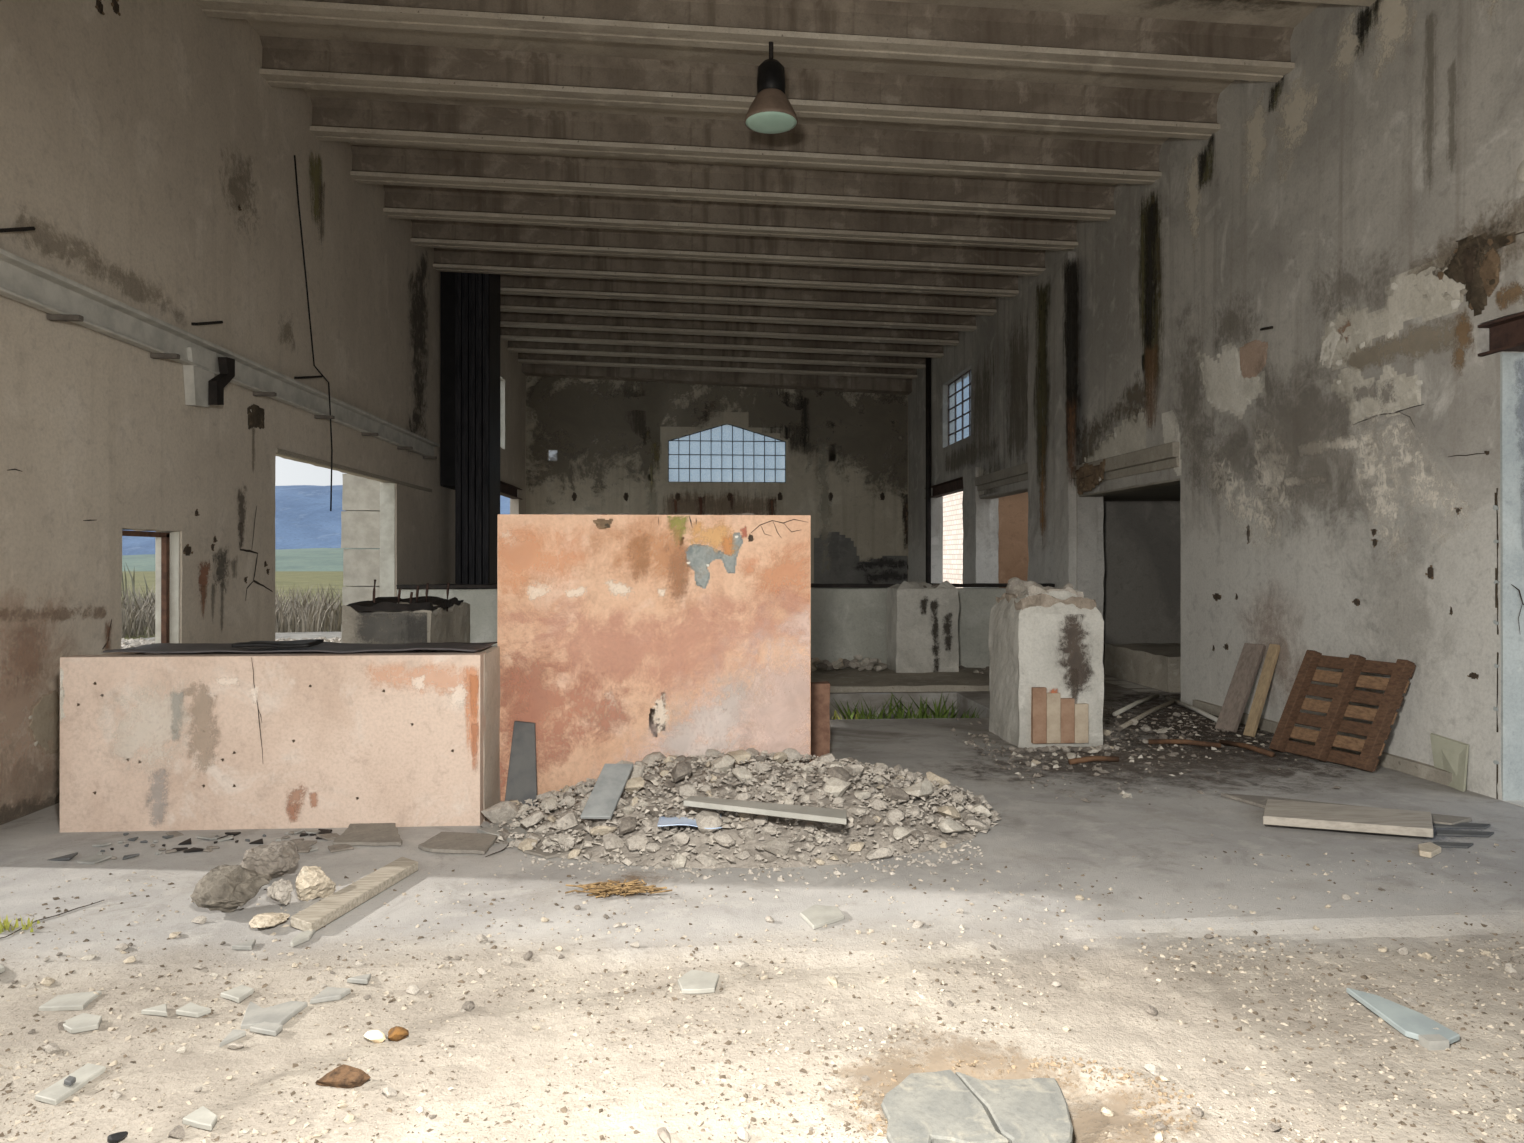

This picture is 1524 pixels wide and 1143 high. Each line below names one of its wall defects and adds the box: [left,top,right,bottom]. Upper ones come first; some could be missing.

damp [946,192,1163,538]
flaking render [1318,231,1516,424]
corrosion [1496,284,1524,310]
damp [212,487,246,629]
peeling [684,532,754,589]
damp [1059,614,1093,700]
damp [171,685,218,771]
crack [251,657,263,759]
corrosion [465,669,479,764]
damp [956,692,1354,789]